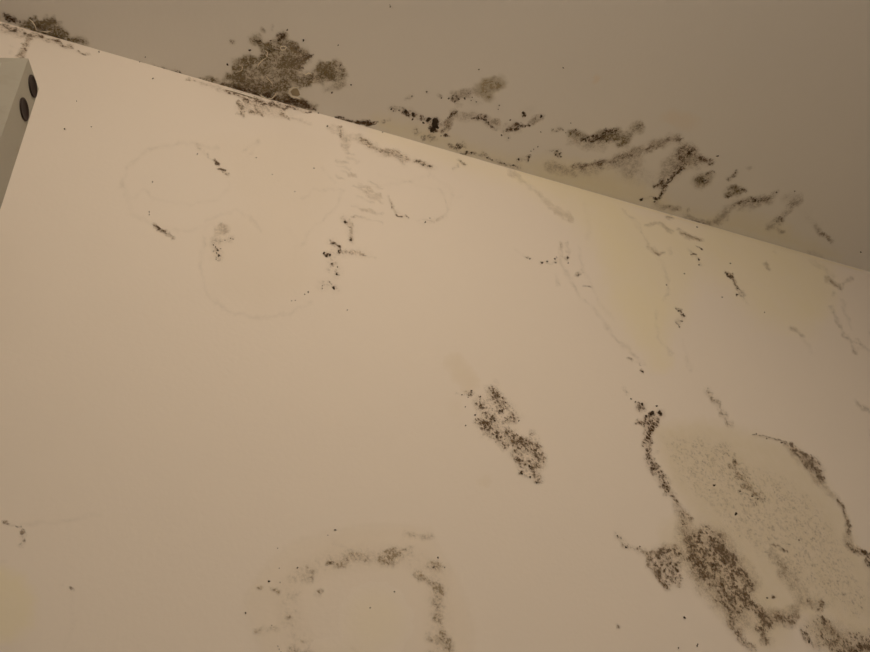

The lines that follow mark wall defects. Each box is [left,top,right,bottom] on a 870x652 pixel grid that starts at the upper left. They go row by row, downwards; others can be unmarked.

water stain [3,13,85,57]
water stain [189,29,352,116]
water stain [327,80,849,378]
water stain [440,351,546,483]
water stain [239,518,479,652]
water stain [617,392,870,652]